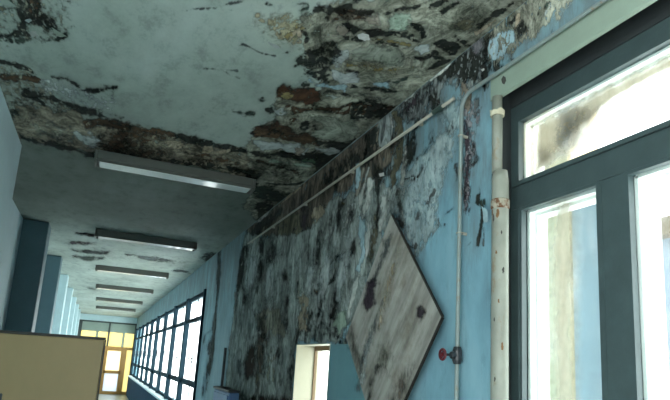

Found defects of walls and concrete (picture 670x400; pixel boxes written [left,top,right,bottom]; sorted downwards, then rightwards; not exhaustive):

spalling [0,0,573,220]
rust [276,84,322,106]
damp [246,0,514,273]
damp [70,232,108,261]
peeling [475,194,488,247]
damp [346,234,395,400]
damp [237,333,290,400]